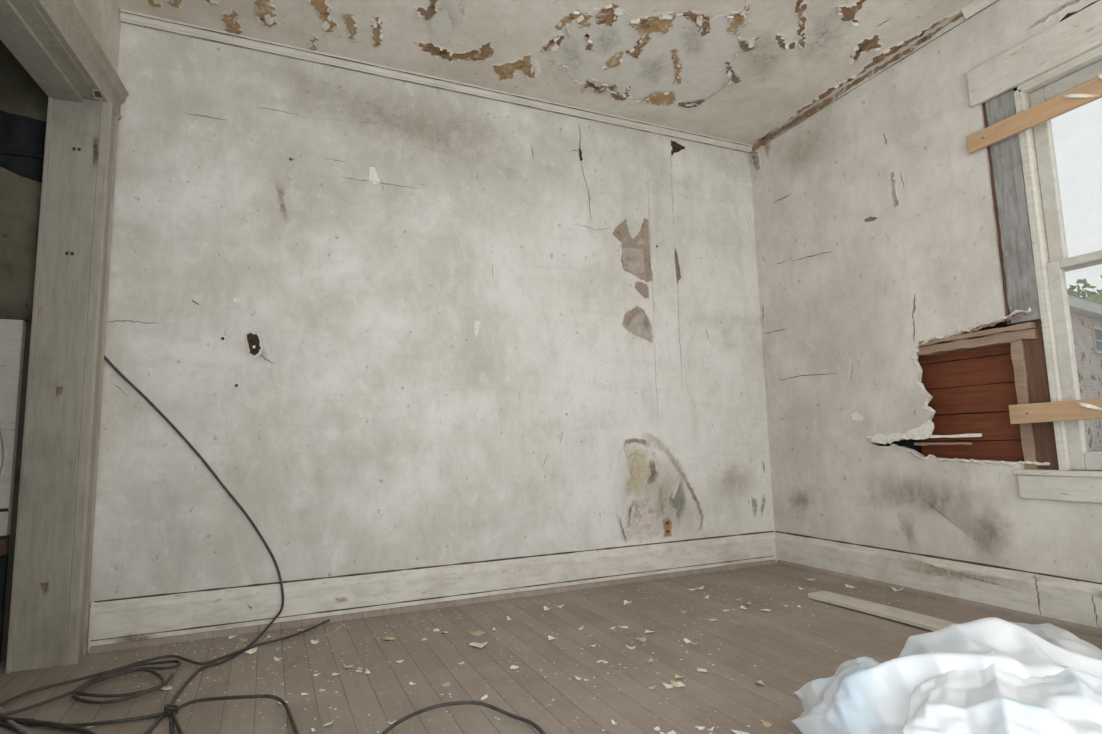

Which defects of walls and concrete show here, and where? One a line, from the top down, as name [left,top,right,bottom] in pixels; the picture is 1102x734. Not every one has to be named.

peeling [203,0,281,39]
peeling [305,0,386,51]
peeling [412,0,760,108]
peeling [773,0,810,52]
peeling [831,0,884,66]
peeling [1027,0,1100,32]
crack [572,125,603,230]
spalling [610,217,654,345]
spalling [244,330,275,364]
spalling [865,308,1059,470]